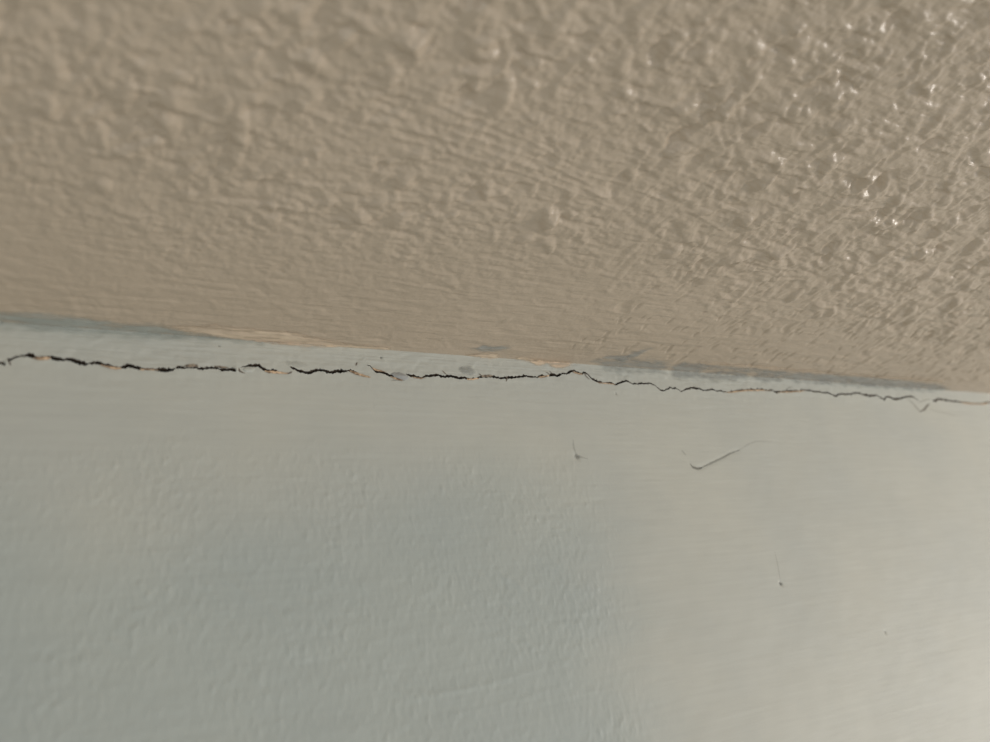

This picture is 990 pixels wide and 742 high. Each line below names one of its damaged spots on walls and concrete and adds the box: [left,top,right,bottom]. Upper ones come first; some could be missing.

crack [0,353,990,410]